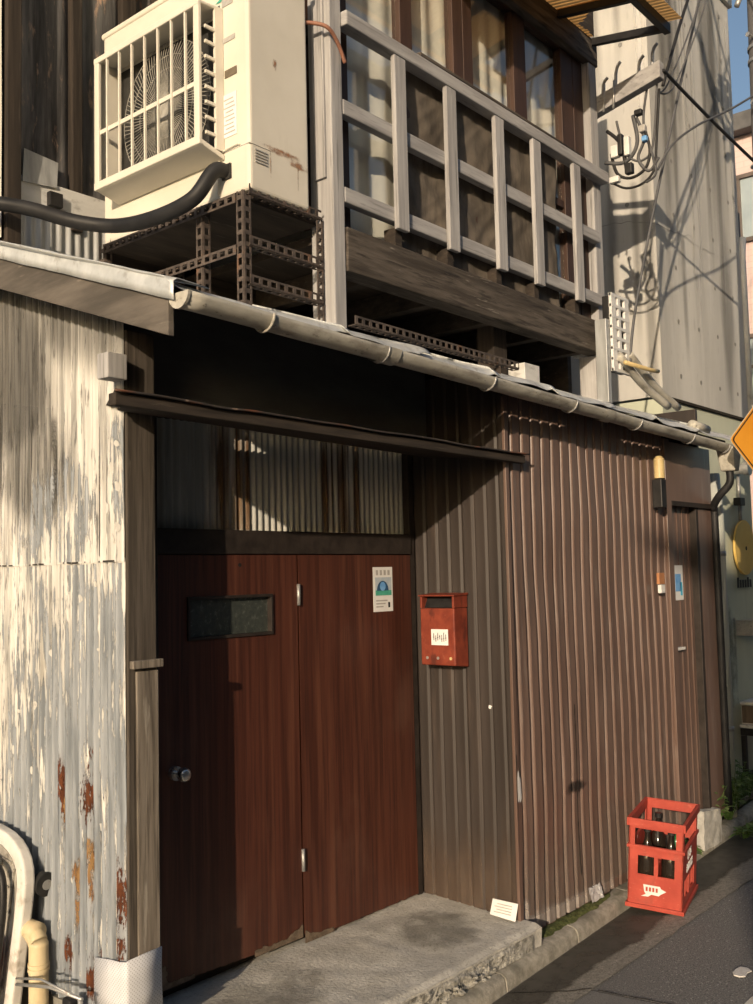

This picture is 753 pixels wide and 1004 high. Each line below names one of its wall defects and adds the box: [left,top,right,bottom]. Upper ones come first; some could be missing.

leakage [50,303,64,341]
leakage [0,289,57,494]
peeling [0,416,127,1004]
rust [64,747,104,972]
rust [85,949,102,1001]
rust [117,857,127,962]
spalling [404,935,534,1004]
leakage [492,907,667,1004]
leakage [693,828,753,898]